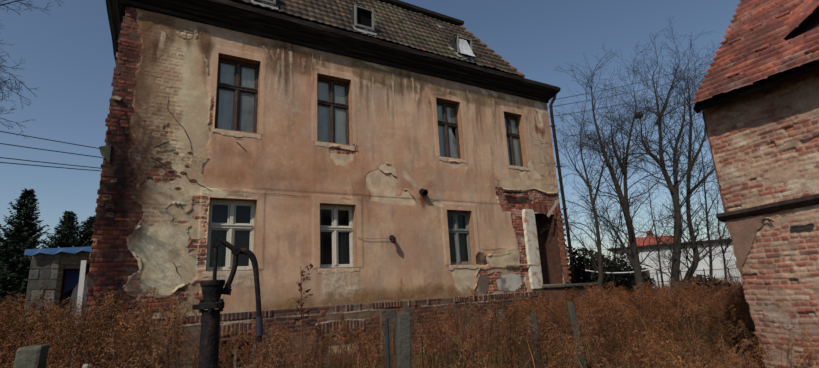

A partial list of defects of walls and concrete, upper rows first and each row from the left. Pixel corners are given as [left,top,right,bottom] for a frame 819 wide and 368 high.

peeling [85,7,257,322]
crack [167,98,213,192]
peeling [329,144,358,165]
peeling [365,162,417,205]
flaking render [451,188,570,295]
peeling [726,215,766,272]